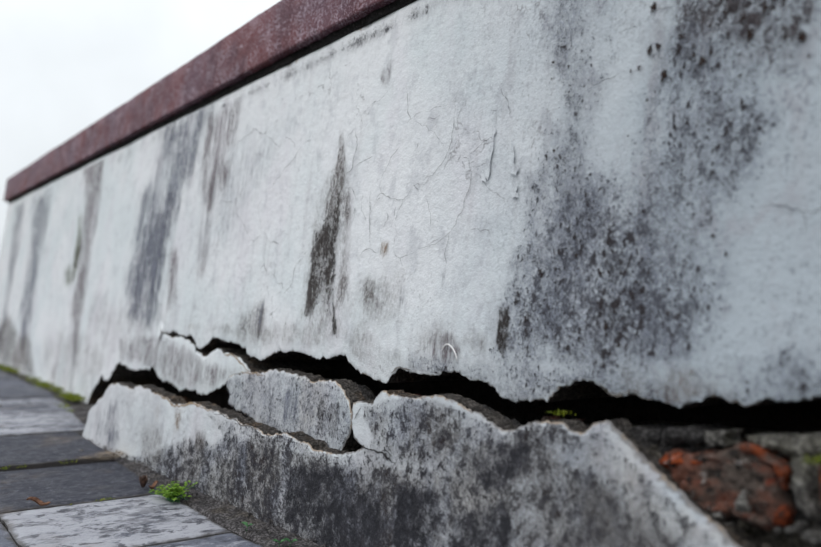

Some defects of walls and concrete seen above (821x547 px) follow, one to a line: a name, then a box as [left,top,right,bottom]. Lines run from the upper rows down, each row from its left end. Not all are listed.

leakage [285,21,393,77]
leakage [0,193,50,375]
leakage [63,160,103,361]
leakage [120,101,714,547]
crack [347,84,502,264]
leakage [471,0,821,402]
crack [157,353,264,429]
crack [358,445,394,463]
crack [313,360,821,456]
spalling [630,420,821,547]
crack [791,489,821,528]